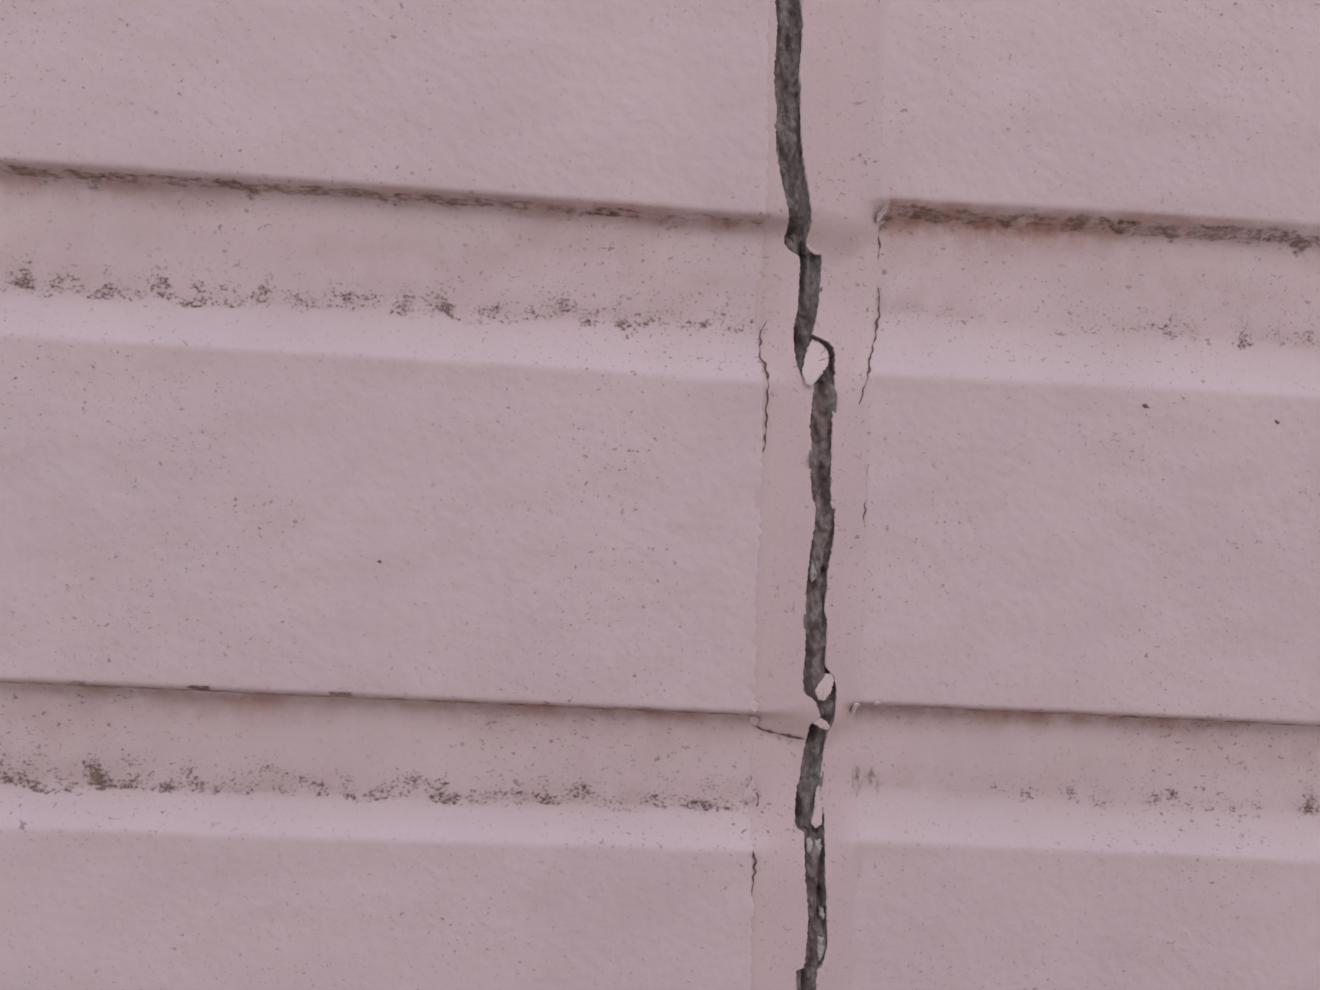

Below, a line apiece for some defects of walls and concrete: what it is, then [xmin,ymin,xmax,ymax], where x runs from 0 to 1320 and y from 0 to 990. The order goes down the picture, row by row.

water stain [3,261,34,292]
water stain [129,267,460,320]
crack [756,0,881,990]
water stain [0,754,219,793]
water stain [343,773,621,811]
water stain [646,794,730,812]
crack [750,851,758,896]